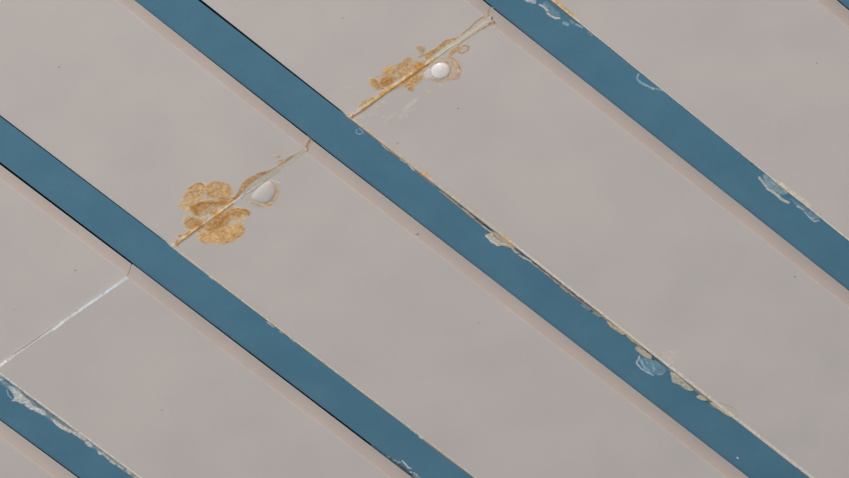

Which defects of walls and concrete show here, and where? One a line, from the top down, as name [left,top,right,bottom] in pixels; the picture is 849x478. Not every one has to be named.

peeling [524,0,593,37]
crack [352,16,491,117]
rust [170,136,312,247]
crack [180,147,307,242]
peeling [484,231,515,249]
rust [344,7,809,478]
crack [0,276,129,368]
peeling [635,355,668,376]